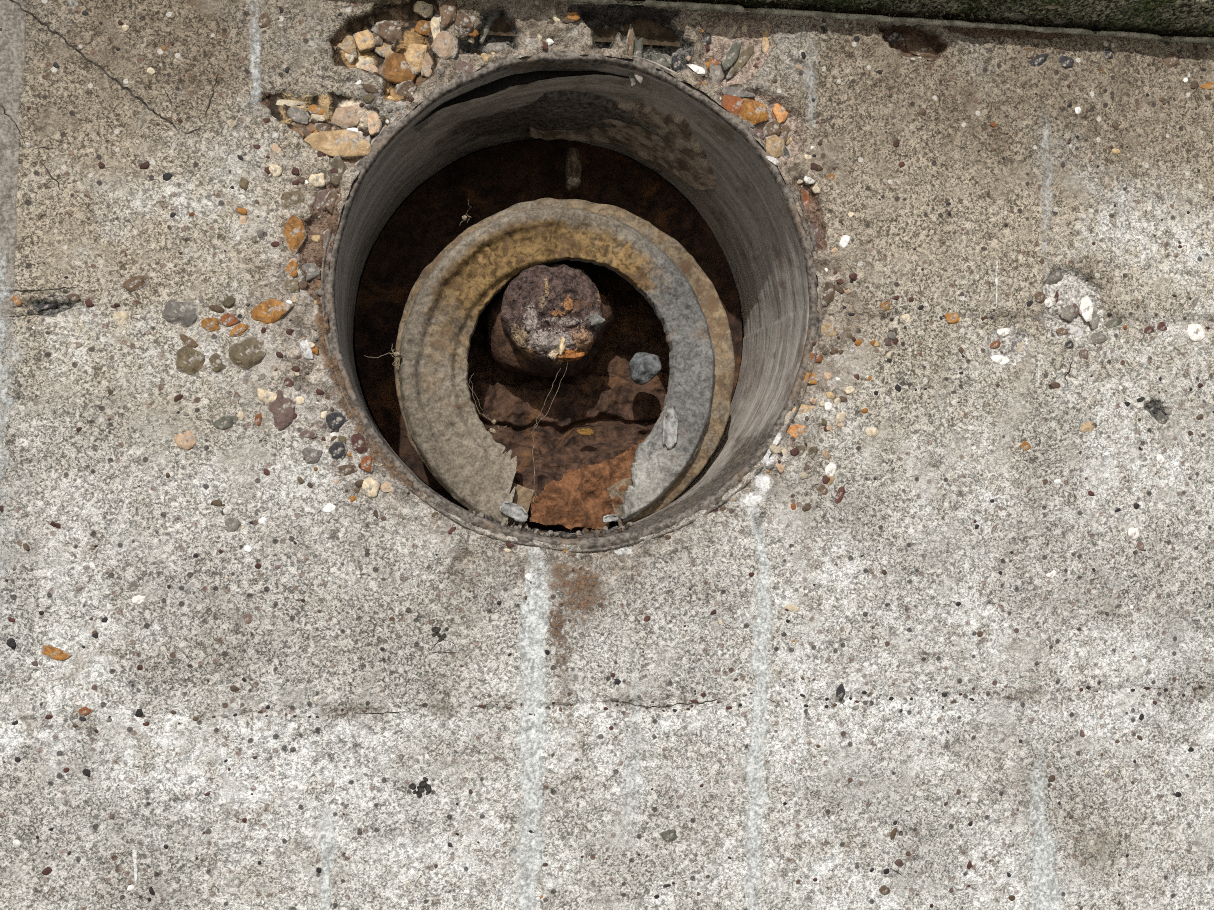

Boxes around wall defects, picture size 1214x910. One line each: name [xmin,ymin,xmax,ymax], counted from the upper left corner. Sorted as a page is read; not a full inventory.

crack [10,0,218,134]
spalling [257,0,519,165]
spalling [585,15,826,251]
corrosion [468,262,670,509]
damp [515,547,549,910]
corrosion [549,563,611,660]
damp [732,433,781,910]